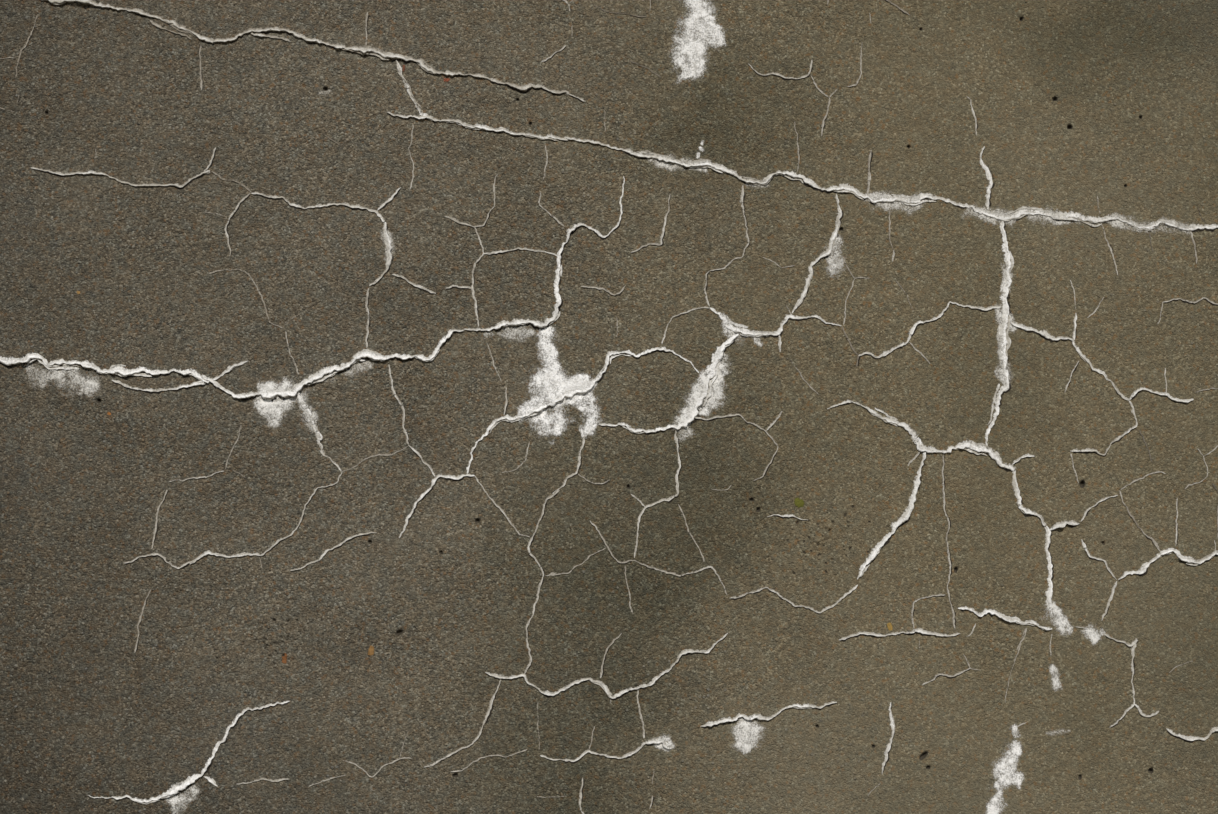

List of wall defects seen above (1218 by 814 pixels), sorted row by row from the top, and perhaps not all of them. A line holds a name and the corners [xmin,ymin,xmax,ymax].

crack [41,0,1218,628]
crack [0,147,728,767]
crack [88,701,290,804]
crack [309,731,412,787]
crack [451,749,527,772]
crack [537,778,584,814]
crack [700,701,837,729]
crack [868,702,895,795]
crack [839,594,961,642]
crack [958,606,1053,703]
crack [1104,633,1159,728]
crack [1166,727,1218,743]